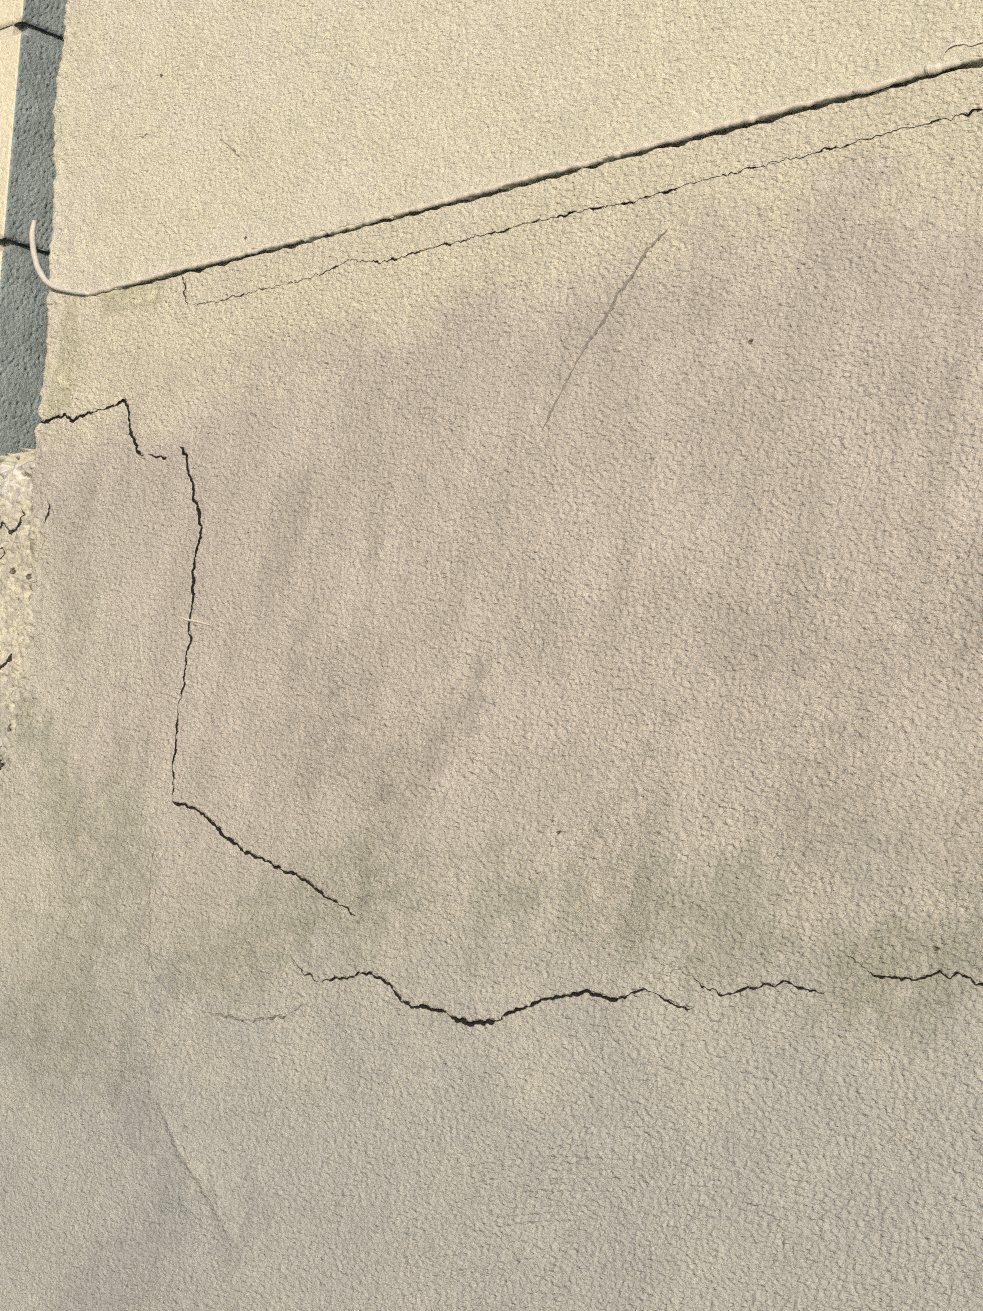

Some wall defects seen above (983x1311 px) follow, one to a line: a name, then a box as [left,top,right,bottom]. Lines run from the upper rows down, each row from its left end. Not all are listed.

crack [40,399,357,917]
crack [207,959,826,1026]
crack [848,956,983,986]